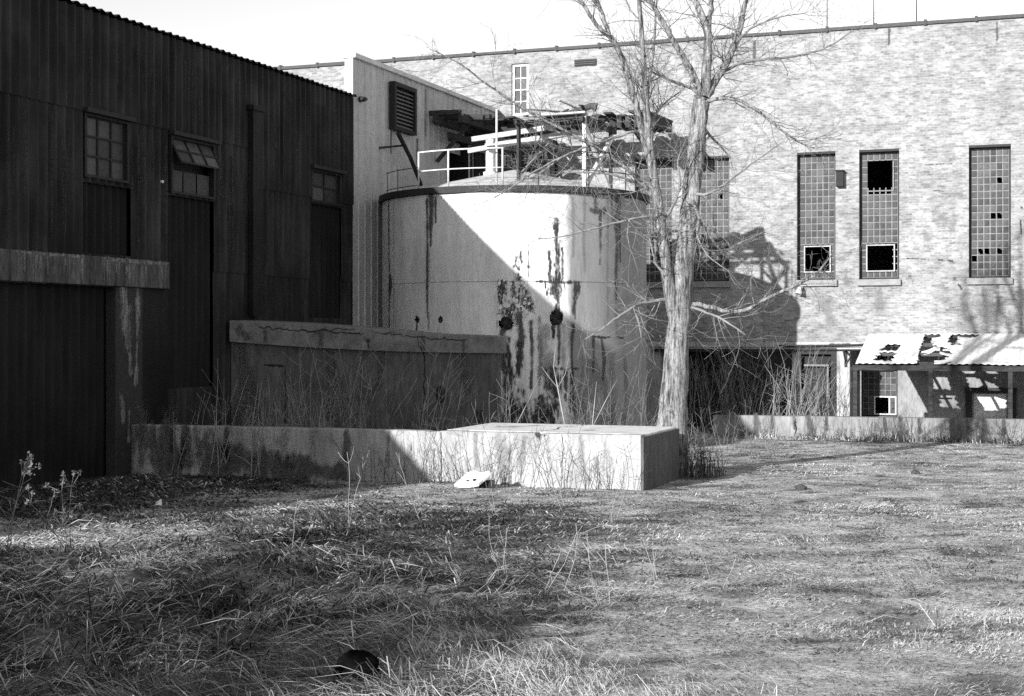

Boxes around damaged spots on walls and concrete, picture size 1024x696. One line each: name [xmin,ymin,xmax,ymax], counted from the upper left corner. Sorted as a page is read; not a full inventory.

crack [258,326,466,467]
corrosion [501,218,581,424]